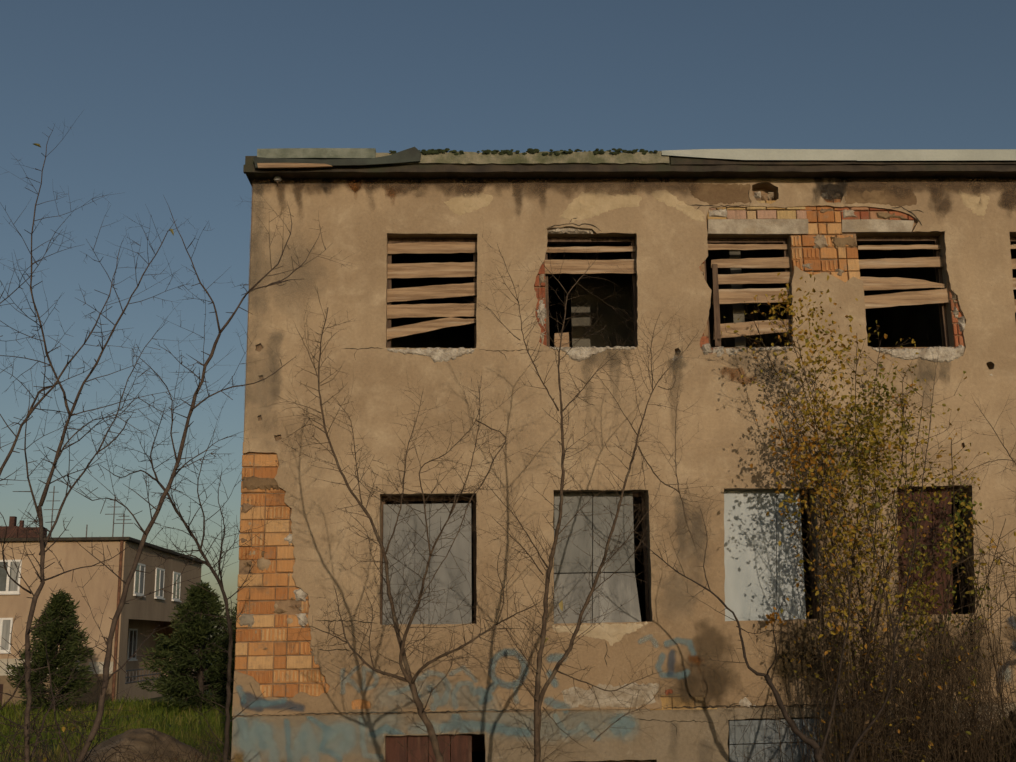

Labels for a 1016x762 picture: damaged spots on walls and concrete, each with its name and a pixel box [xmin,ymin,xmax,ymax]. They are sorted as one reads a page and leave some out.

damp [252,178,699,205]
damp [814,177,1016,212]
flaking render [534,260,547,346]
flaking render [890,290,966,362]
flaking render [700,333,737,357]
flaking render [235,442,330,698]
peeling [561,682,717,711]